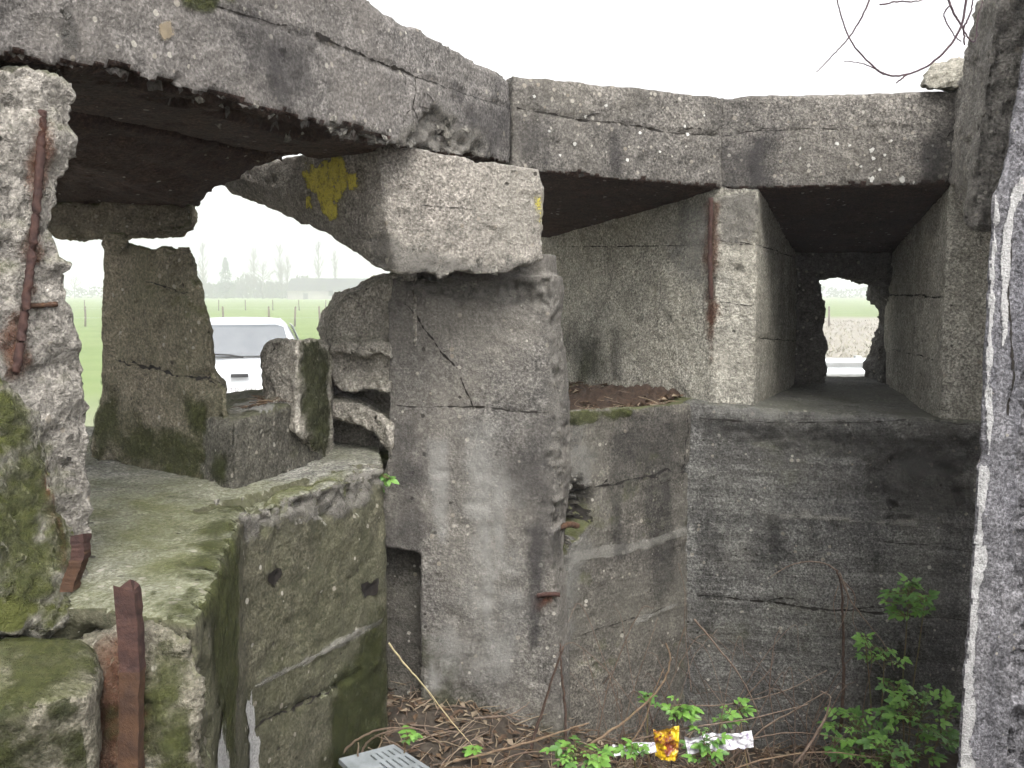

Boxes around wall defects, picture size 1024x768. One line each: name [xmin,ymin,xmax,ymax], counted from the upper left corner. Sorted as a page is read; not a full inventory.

corrosion [705,292,717,339]
crack [397,304,546,413]
crack [595,411,964,487]
crack [698,595,968,622]